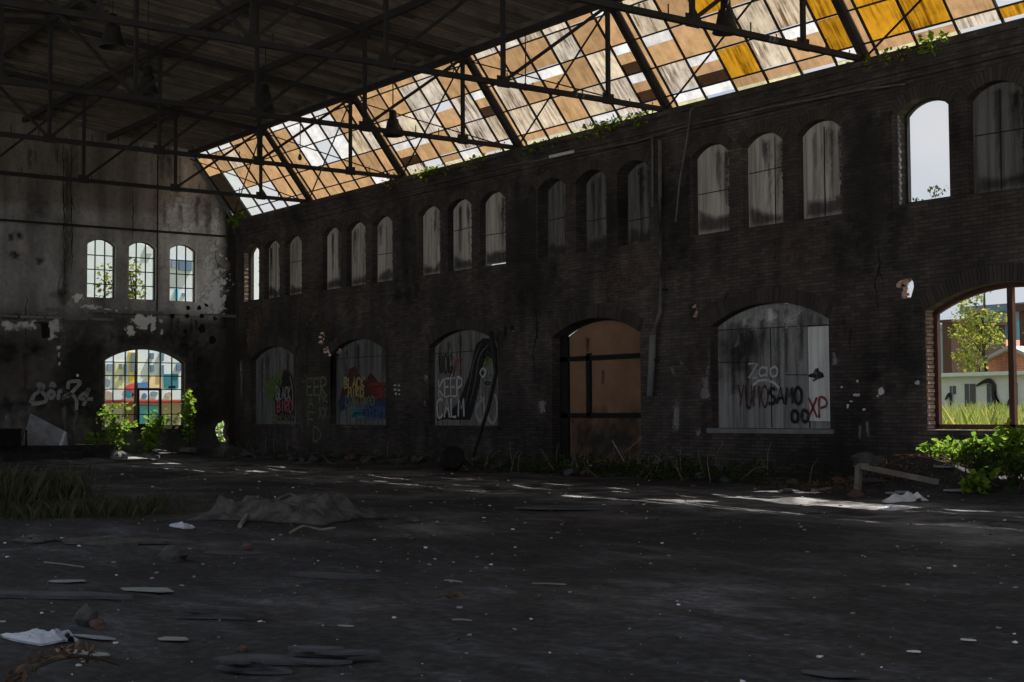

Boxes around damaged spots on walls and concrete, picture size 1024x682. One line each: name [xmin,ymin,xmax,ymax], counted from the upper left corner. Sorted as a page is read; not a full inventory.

flaking render [71,237,234,344]
spalling [896,278,912,299]
flaking render [2,319,61,366]